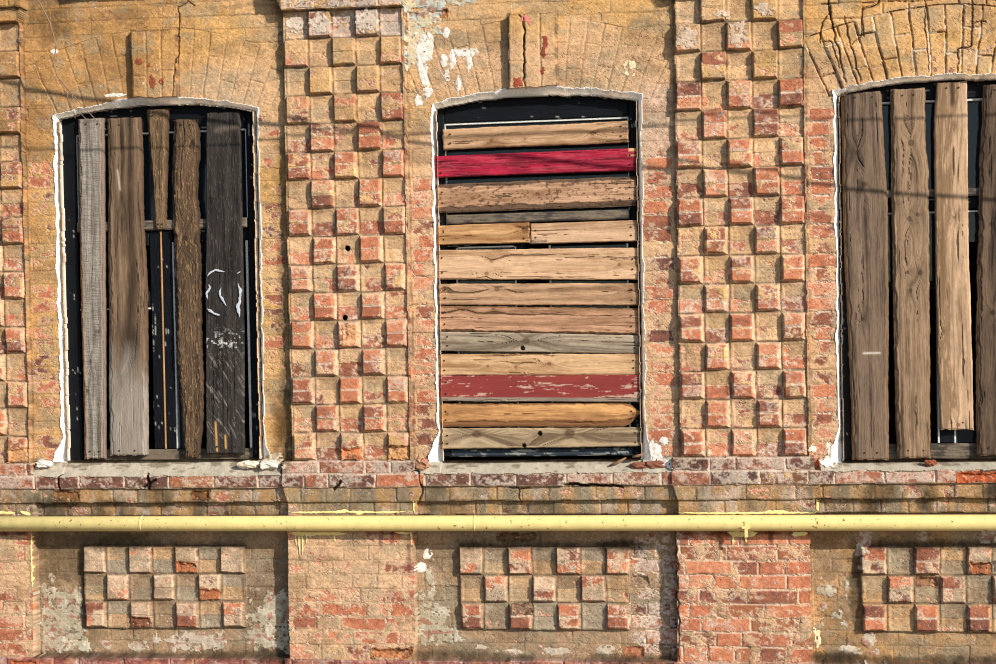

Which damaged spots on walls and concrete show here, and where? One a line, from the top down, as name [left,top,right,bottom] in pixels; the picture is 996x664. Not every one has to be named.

crack [172,0,193,95]
peeling [401,0,479,108]
crack [519,16,527,84]
peeling [540,36,548,74]
crack [819,0,879,81]
crack [957,0,984,70]
peeling [9,573,112,664]
peeling [128,617,227,658]
peeling [244,585,291,654]